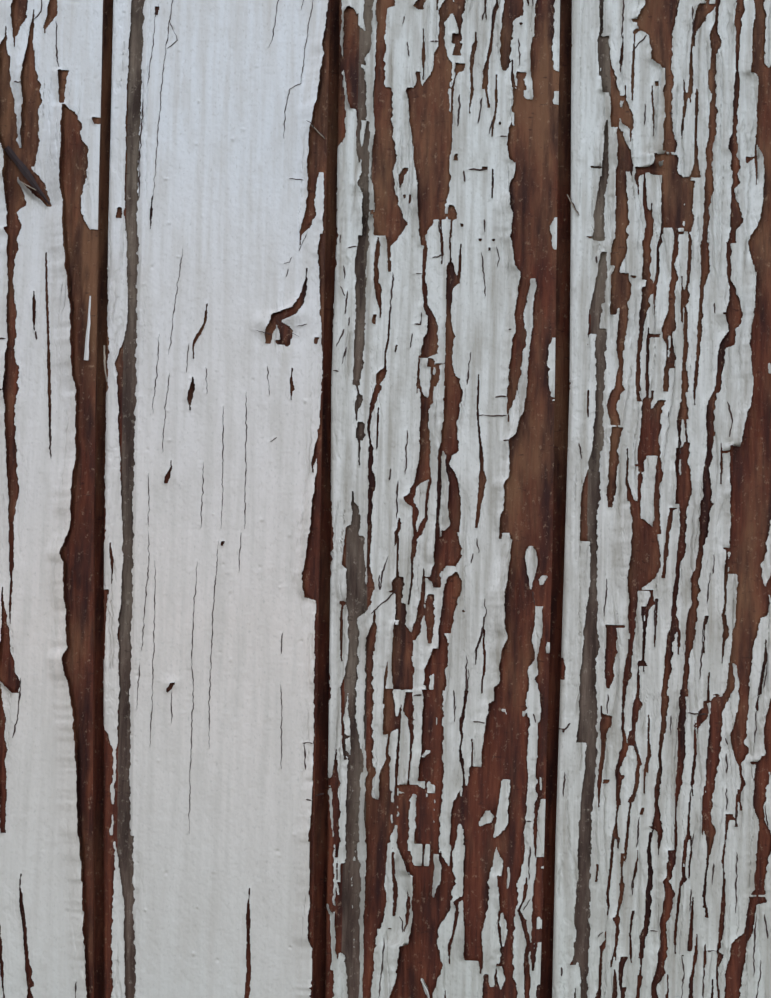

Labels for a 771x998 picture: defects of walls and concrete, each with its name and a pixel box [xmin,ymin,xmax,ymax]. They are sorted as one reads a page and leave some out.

peeling [0,0,159,998]
peeling [262,0,564,998]
peeling [570,0,771,998]